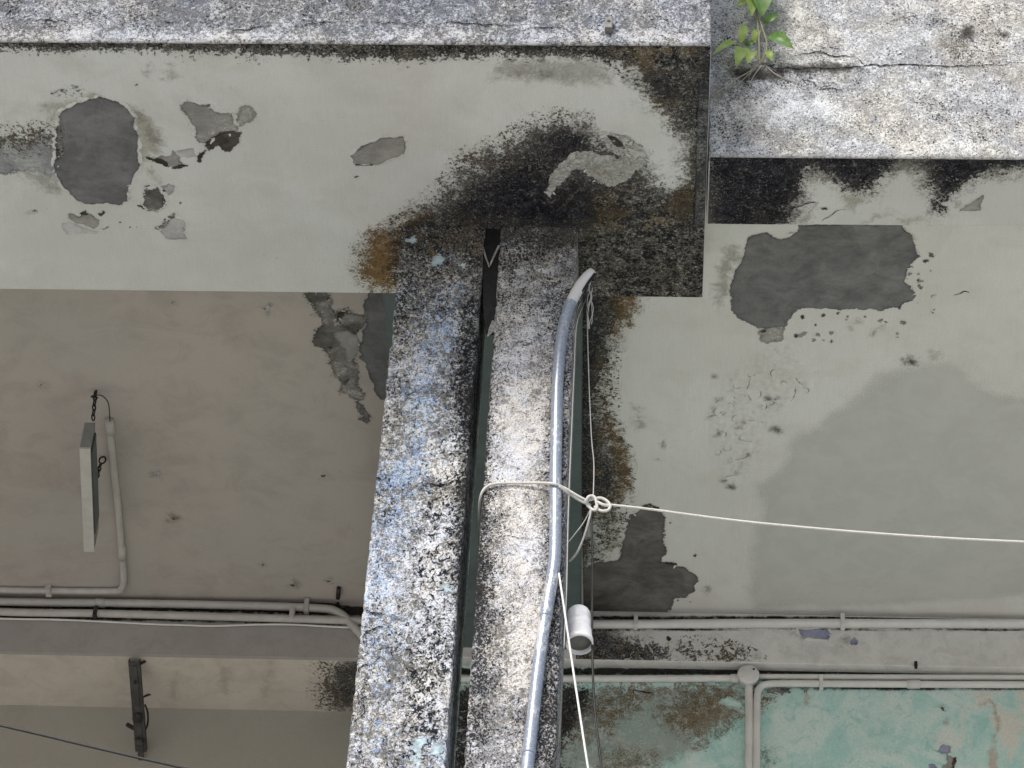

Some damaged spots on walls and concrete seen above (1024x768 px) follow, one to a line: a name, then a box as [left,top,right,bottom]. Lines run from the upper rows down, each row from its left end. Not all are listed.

crack [761,51,1024,90]
spalling [127,184,181,213]
peeling [146,98,257,169]
peeling [348,134,409,178]
peeling [544,134,649,197]
peeling [302,292,373,424]
leakage [0,43,1024,614]
leakage [802,680,1024,690]
leakage [455,683,469,768]
leakage [560,682,754,768]